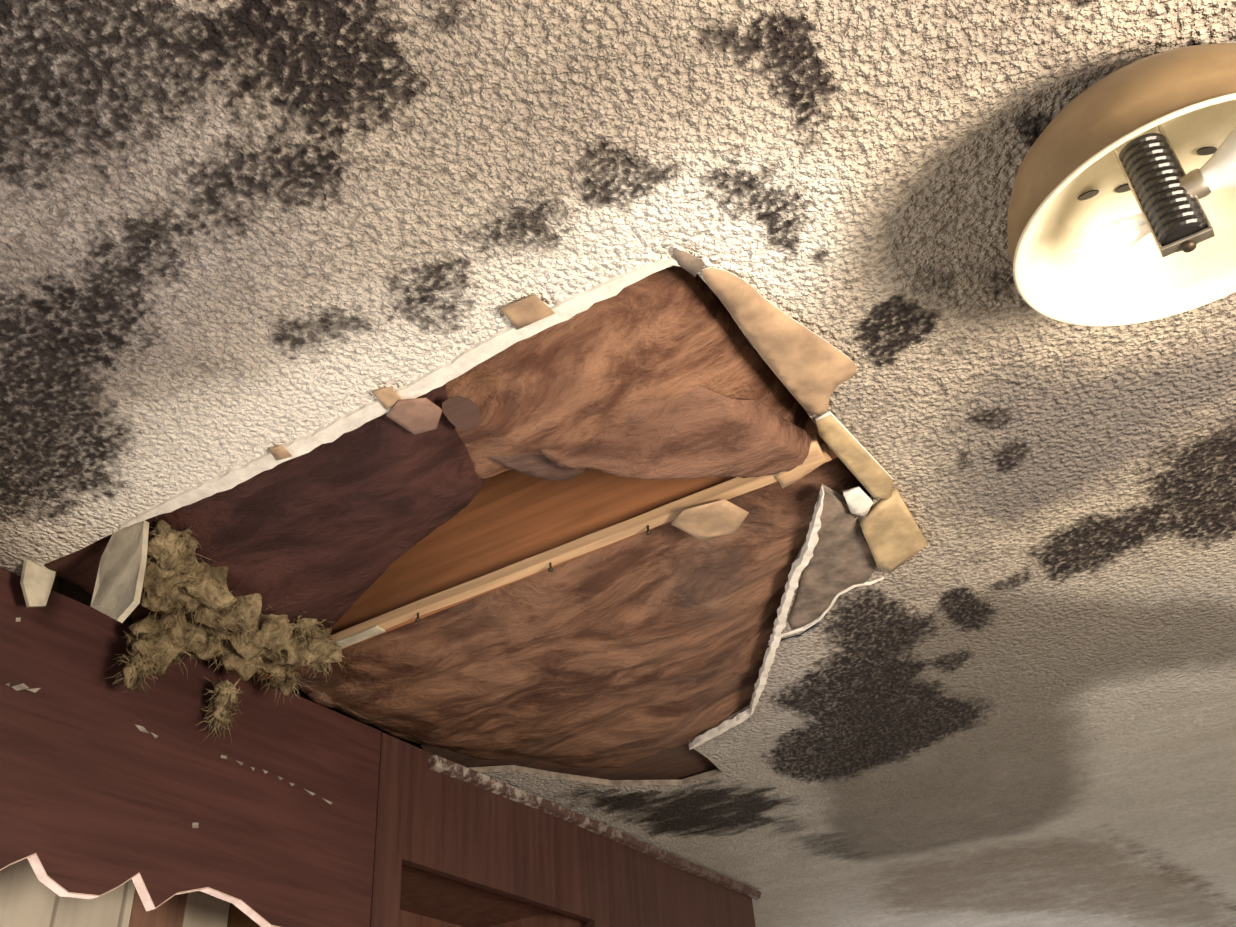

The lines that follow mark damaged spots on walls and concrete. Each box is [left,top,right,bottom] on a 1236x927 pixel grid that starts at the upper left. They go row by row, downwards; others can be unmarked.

water stain [704,14,837,127]
water stain [1017,114,1052,146]
water stain [0,0,427,521]
water stain [390,191,567,331]
water stain [705,163,812,259]
water stain [853,296,941,367]
spalling [90,248,705,623]
peeling [20,560,56,607]
peeling [689,486,876,750]
water stain [762,364,1236,856]